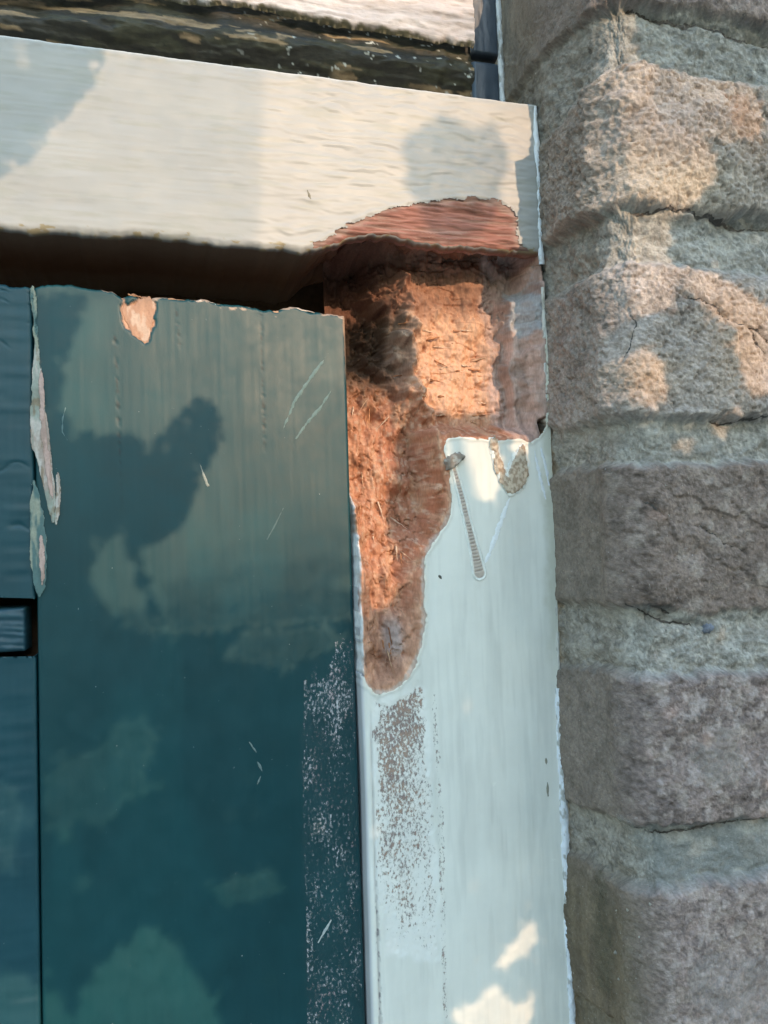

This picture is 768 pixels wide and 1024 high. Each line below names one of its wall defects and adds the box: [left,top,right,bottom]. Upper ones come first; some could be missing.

peeling [30,285,61,597]
spalling [121,293,156,343]
spalling [295,196,548,929]
crack [632,205,768,232]
peeling [304,756,362,1023]